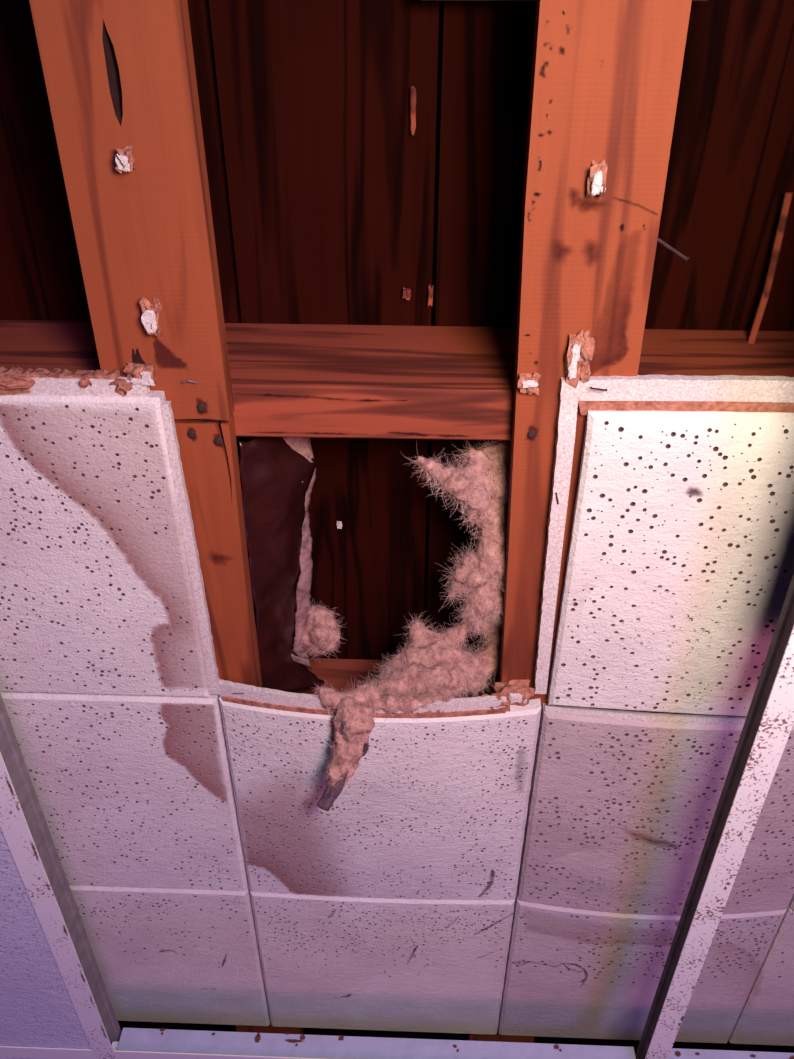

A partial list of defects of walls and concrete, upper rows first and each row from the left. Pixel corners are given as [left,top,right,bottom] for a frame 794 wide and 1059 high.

damp [0,406,183,687]
damp [162,704,225,800]